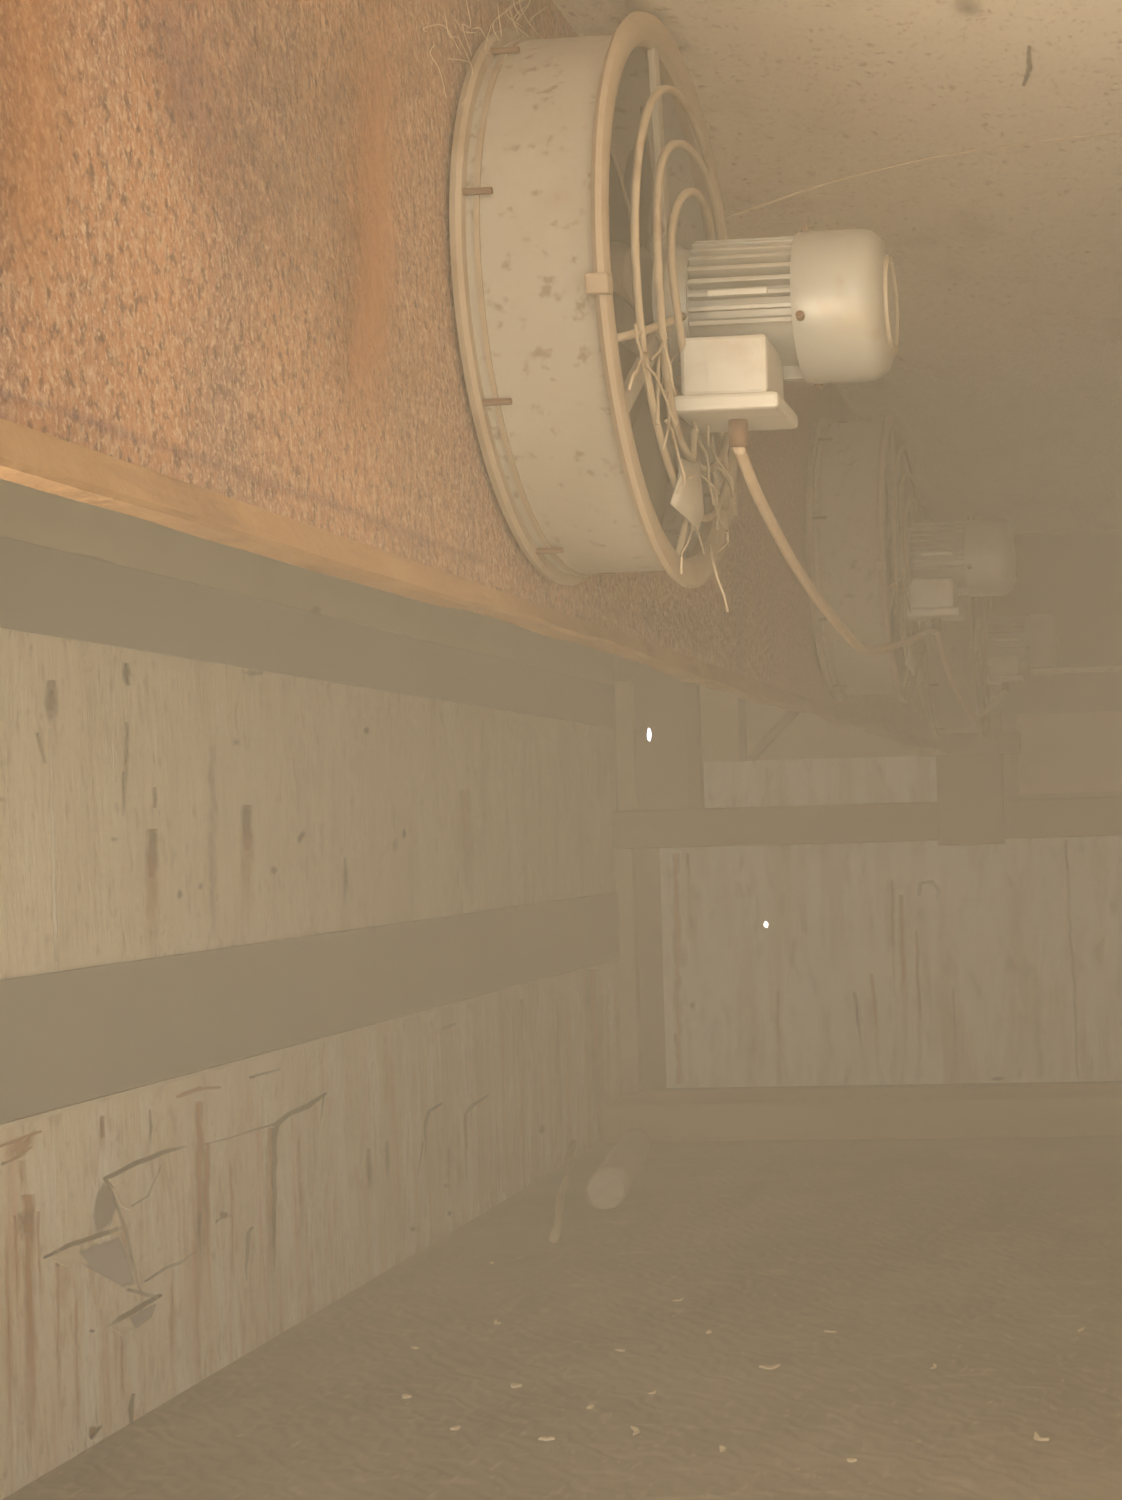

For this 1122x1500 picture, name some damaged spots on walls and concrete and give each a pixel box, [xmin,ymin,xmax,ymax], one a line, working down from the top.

corrosion [0,1130,42,1373]
peeling [44,1147,179,1336]
corrosion [176,1086,233,1250]